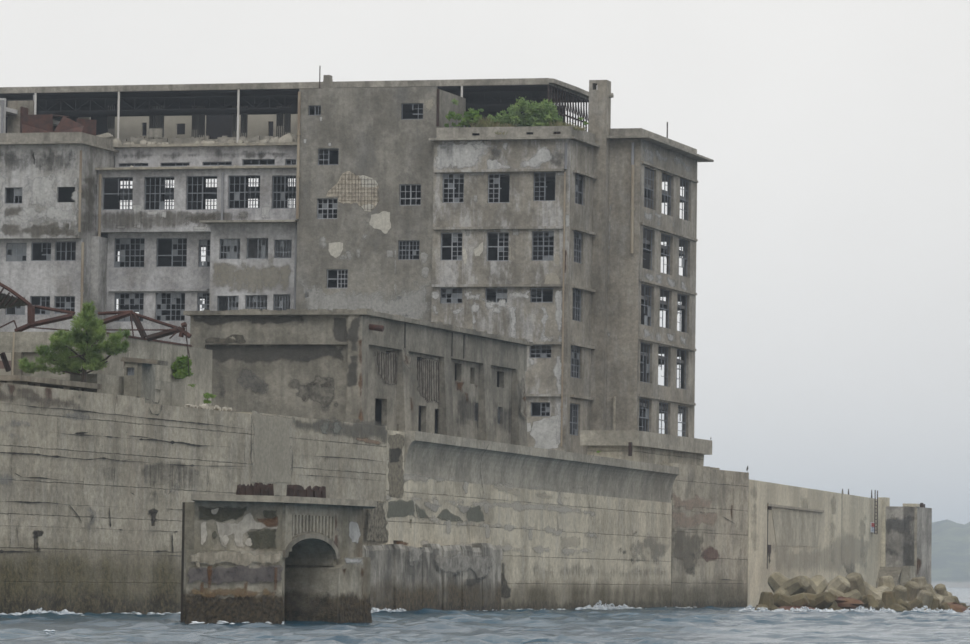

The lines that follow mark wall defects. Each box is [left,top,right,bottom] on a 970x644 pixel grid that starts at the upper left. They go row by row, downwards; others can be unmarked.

spalling [326,171,391,234]
spalling [328,242,343,258]
rust [236,482,274,496]
rust [286,485,326,498]
peeling [201,508,278,547]